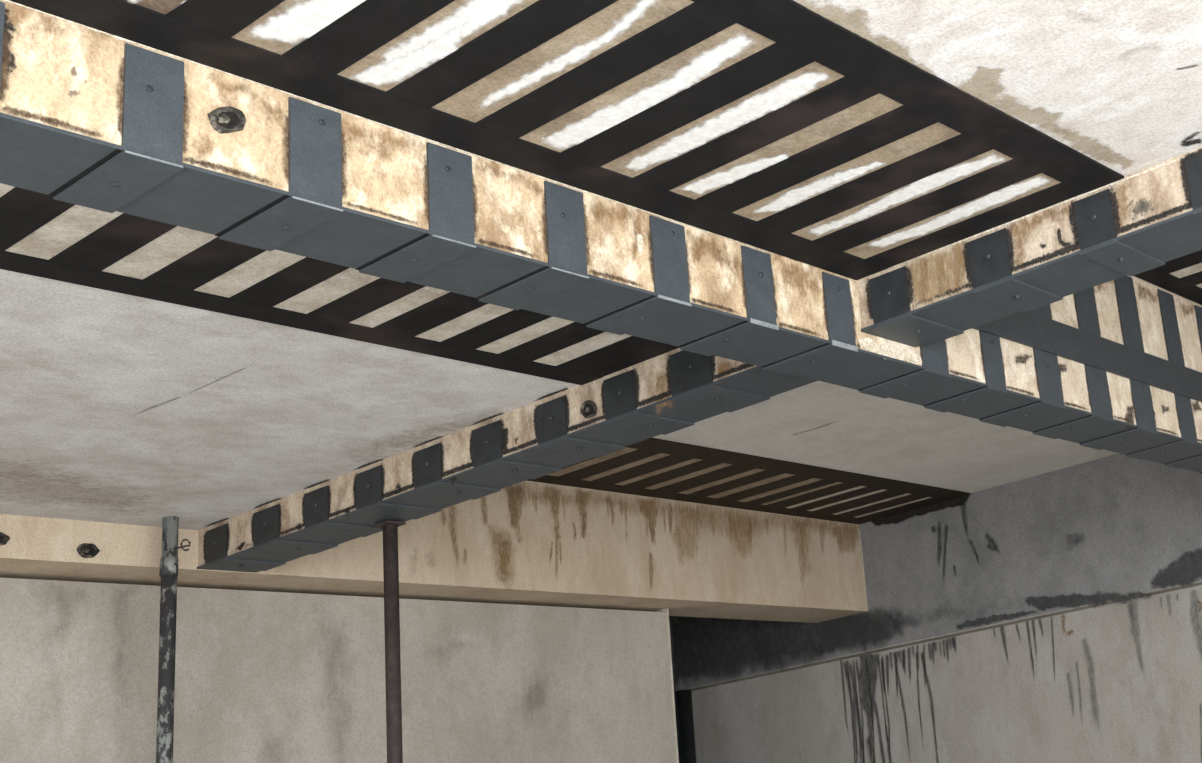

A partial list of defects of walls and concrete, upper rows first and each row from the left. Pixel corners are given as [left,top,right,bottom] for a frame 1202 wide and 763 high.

leakage [795,0,933,75]
leakage [958,67,1132,169]
corrosion [482,485,522,582]
corrosion [545,488,589,573]
corrosion [637,500,671,584]
leakage [671,549,1202,763]